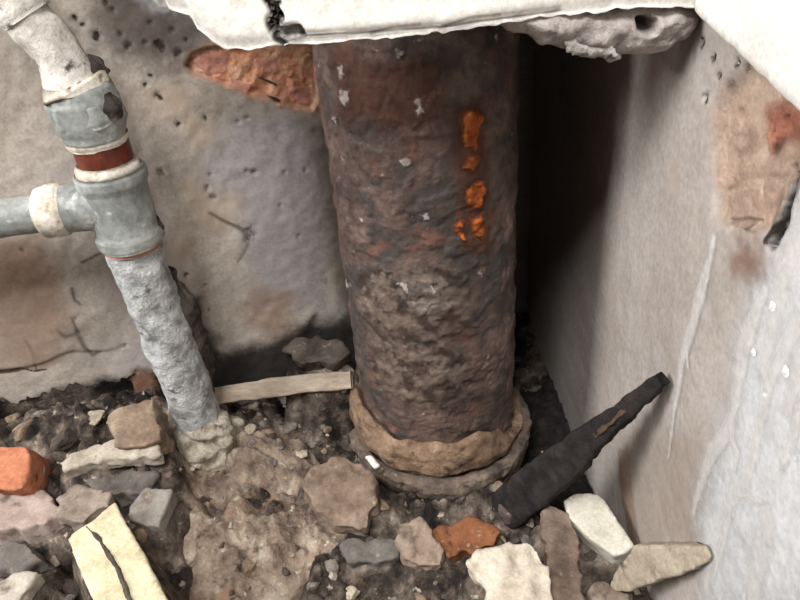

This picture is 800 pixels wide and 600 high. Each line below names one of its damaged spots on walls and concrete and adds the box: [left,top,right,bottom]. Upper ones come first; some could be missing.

spalling [187,44,318,112]
corrosion [454,102,490,251]
spalling [713,58,800,229]
crack [211,213,254,259]
crack [0,342,47,374]